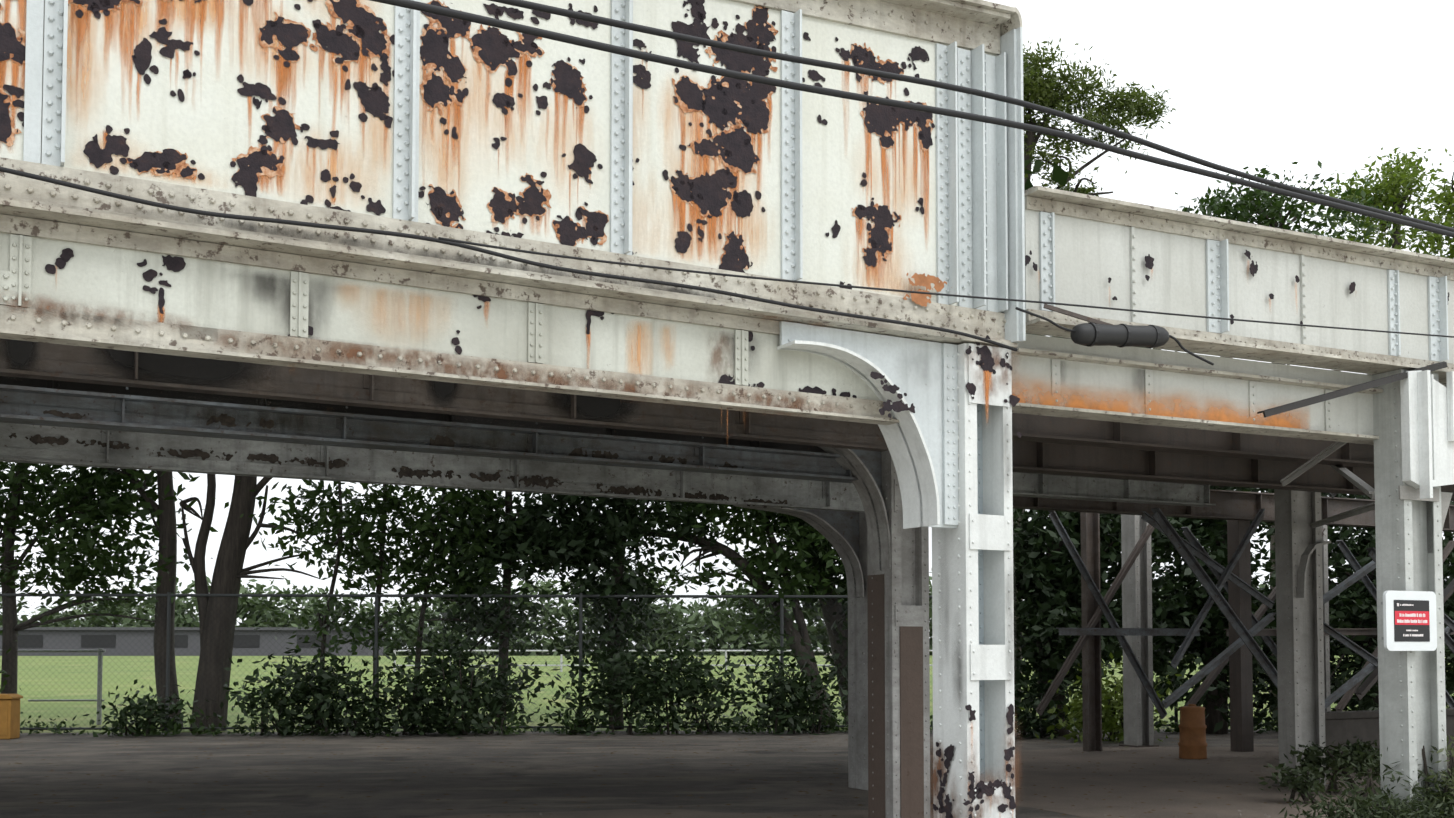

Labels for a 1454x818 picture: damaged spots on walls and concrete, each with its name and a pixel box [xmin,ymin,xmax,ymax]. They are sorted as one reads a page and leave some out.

peeling [0,0,27,146]
peeling [83,125,205,180]
peeling [68,0,223,102]
corrosion [175,0,216,20]
peeling [230,0,395,216]
peeling [419,0,598,152]
peeling [662,0,779,273]
peeling [825,37,935,269]
peeling [486,172,609,247]
corrosion [11,296,123,324]
corrosion [901,273,947,307]
corrosion [991,355,1303,429]